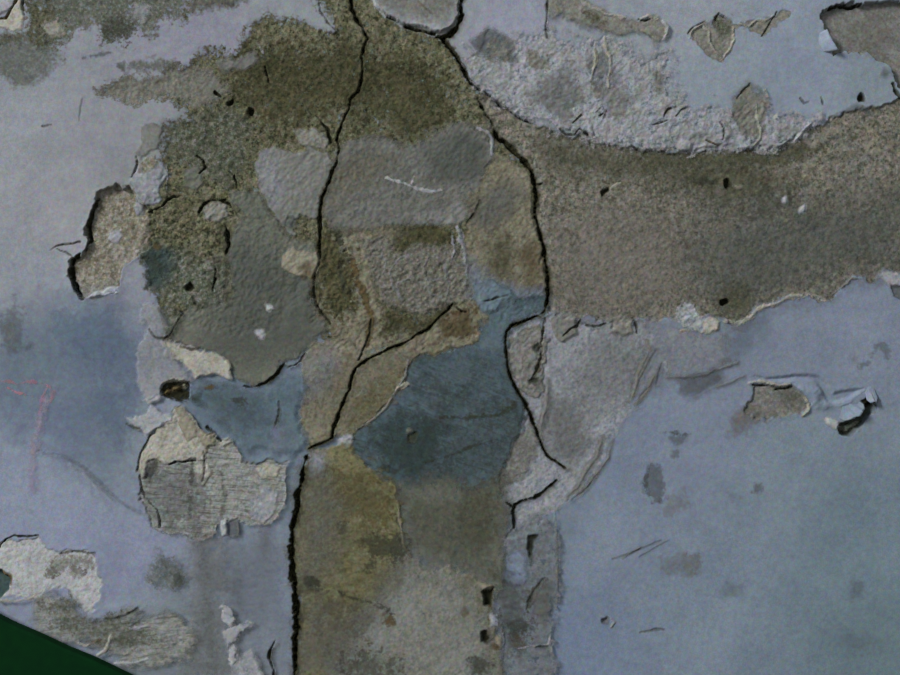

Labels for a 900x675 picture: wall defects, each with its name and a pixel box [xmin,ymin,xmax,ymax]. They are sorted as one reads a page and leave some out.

peeling [0,0,237,50]
peeling [688,10,791,62]
flaking render [818,1,900,88]
crack [313,0,369,324]
flaking render [68,0,772,404]
crack [436,0,565,529]
flaking render [338,83,900,675]
flaking render [127,405,288,540]
crack [267,304,464,675]
flaking render [0,534,197,669]
peeling [219,605,263,675]